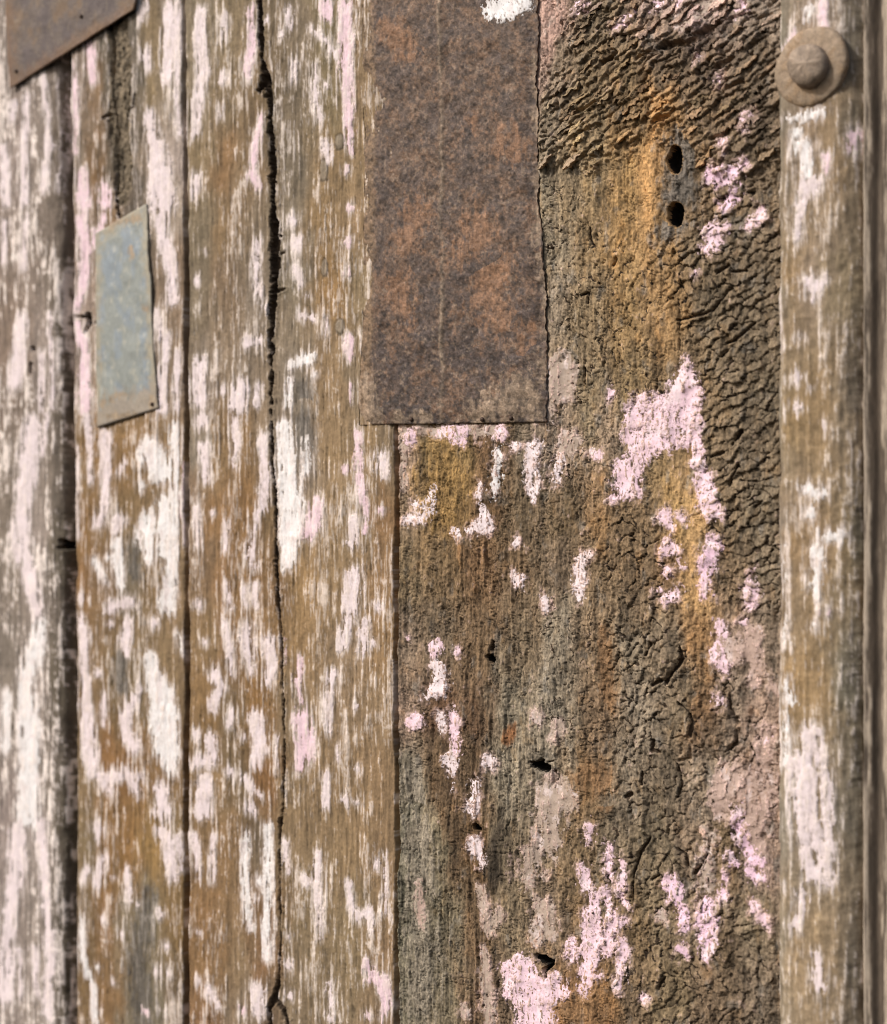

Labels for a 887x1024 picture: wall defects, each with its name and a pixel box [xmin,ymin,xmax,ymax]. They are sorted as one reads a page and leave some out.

peeling [291,0,358,176]
corrosion [369,3,428,75]
peeling [0,308,60,1024]
peeling [77,913,99,1024]
peeling [0,0,231,660]
peeling [77,351,360,971]
crack [256,0,289,1024]
corrosion [359,47,547,548]
peeling [404,637,633,1024]
peeling [335,347,728,661]
peeling [654,567,840,964]
peeling [796,482,846,629]